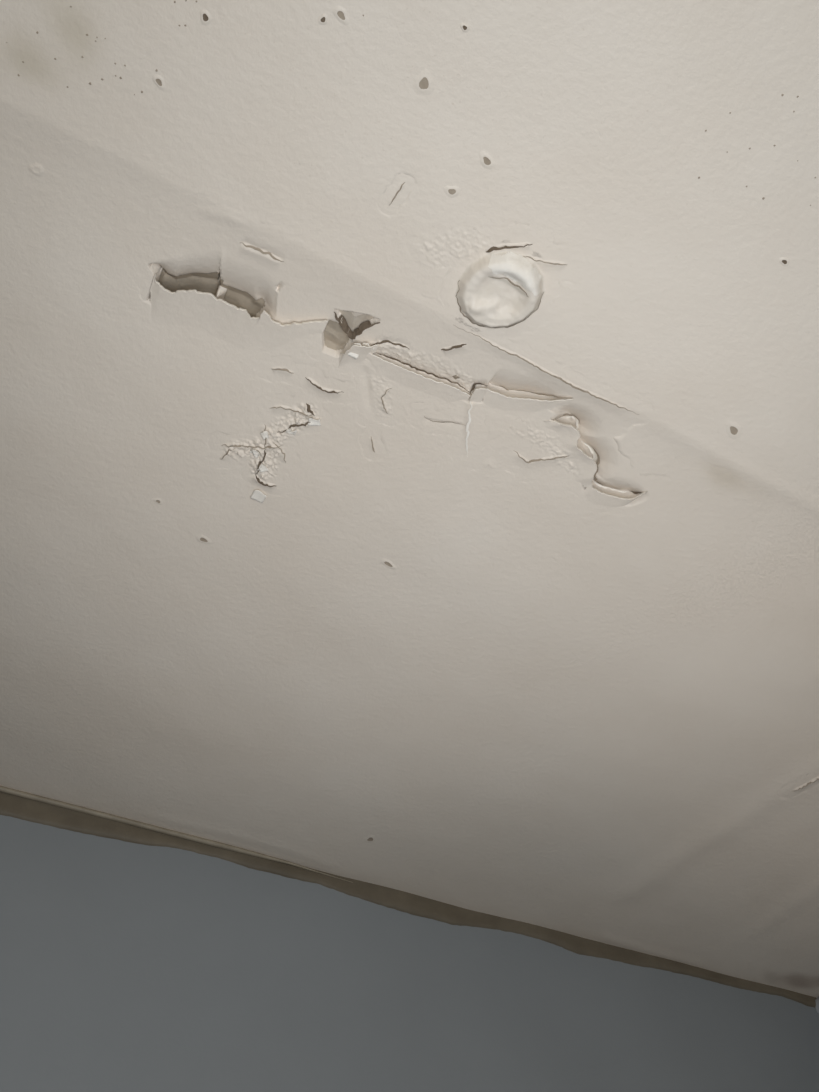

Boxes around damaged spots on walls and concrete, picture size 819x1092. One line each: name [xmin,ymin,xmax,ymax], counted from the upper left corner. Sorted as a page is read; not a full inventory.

hole [158,265,265,317]
peeling [324,310,488,437]
crack [373,314,656,424]
peeling [206,390,332,503]
peeling [488,407,672,516]